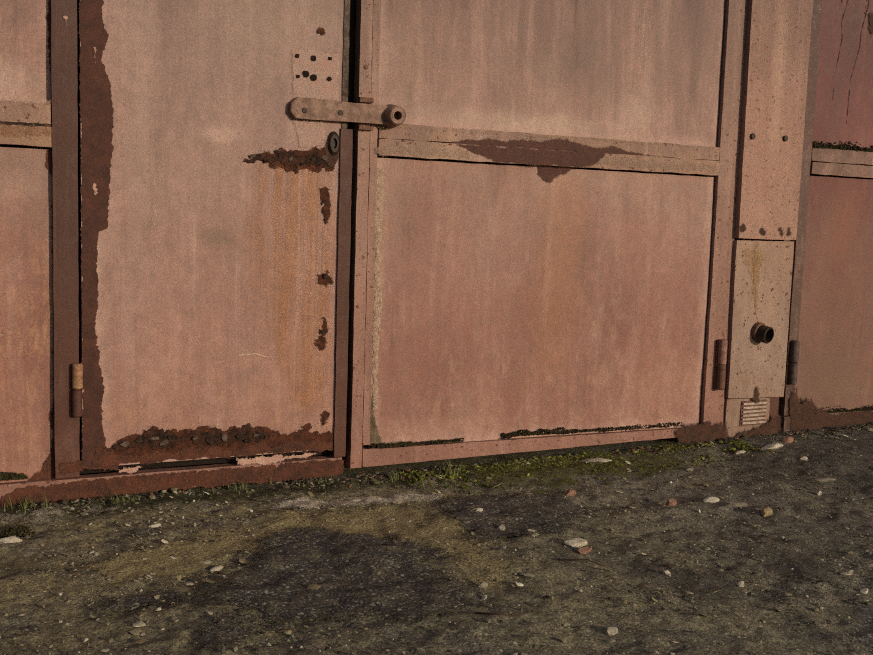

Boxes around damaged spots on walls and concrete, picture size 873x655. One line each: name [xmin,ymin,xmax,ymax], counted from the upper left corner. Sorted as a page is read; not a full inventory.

crack [833,0,869,116]
corrosion [244,136,340,174]
corrosion [101,423,334,456]